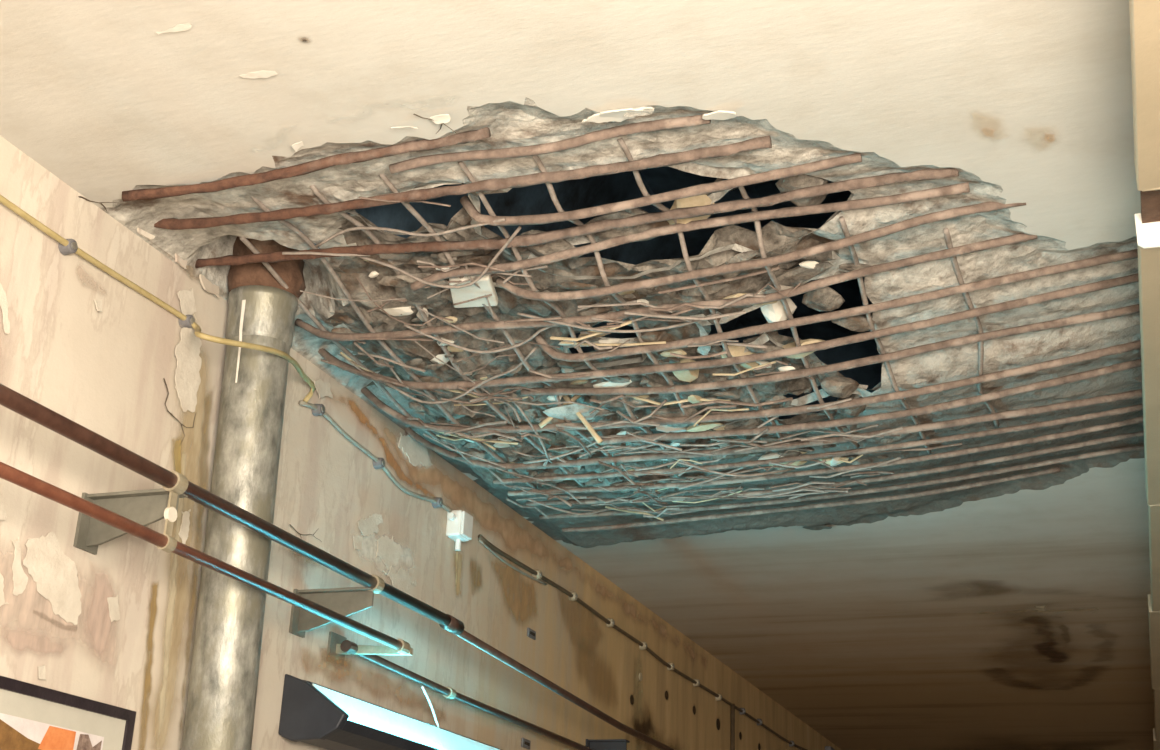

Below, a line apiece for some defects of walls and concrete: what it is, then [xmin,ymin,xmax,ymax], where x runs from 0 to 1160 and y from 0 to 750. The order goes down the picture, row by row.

peeling [0,283,10,334]
spalling [100,97,1145,548]
peeling [0,532,120,680]